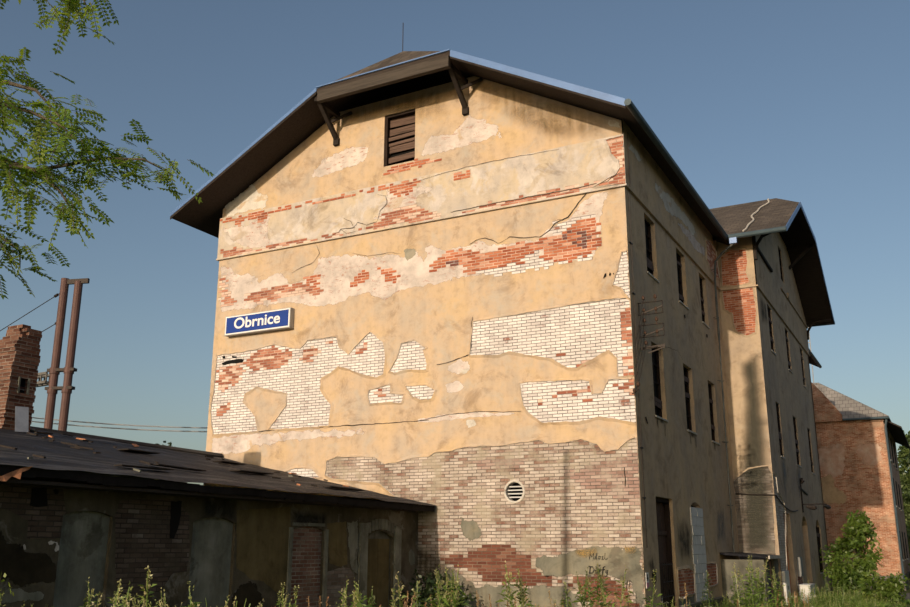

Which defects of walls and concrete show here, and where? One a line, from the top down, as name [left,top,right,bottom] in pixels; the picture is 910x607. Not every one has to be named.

crack [292,195,399,273]
flaking render [218,115,642,312]
crack [453,172,621,244]
flaking render [653,183,758,338]
flaking render [210,249,657,607]
water stain [745,361,767,548]
water stain [0,531,56,587]